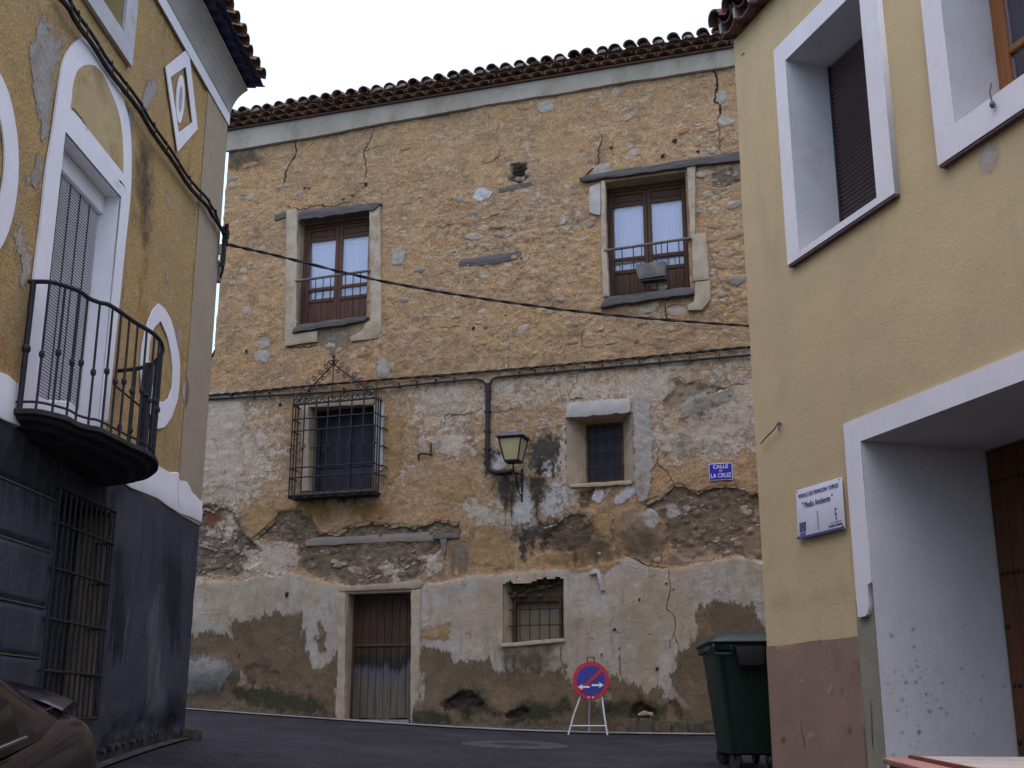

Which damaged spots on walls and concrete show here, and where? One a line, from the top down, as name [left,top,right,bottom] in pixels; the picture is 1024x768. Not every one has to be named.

crack [282,141,352,210]
crack [363,129,377,178]
crack [713,70,722,151]
flaking render [635,283,688,316]
spalling [196,383,762,586]
water stain [482,424,610,562]
crack [624,553,679,654]
peeling [419,598,765,733]